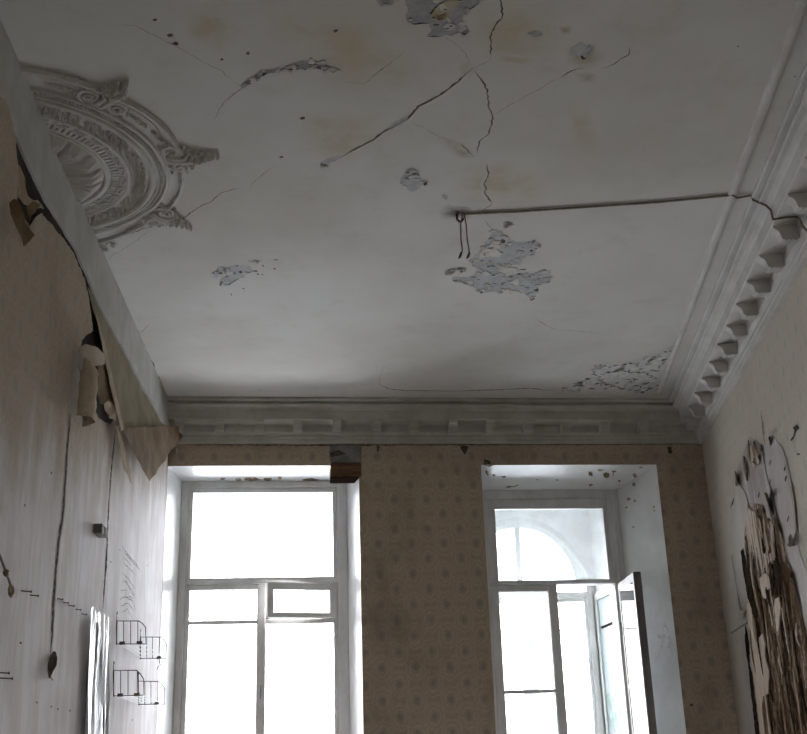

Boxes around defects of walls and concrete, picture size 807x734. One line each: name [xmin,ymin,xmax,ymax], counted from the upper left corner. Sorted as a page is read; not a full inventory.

peeling [376,0,484,38]
peeling [241,58,342,88]
crack [339,0,581,230]
peeling [9,165,44,246]
peeling [400,168,428,192]
peeling [212,260,264,295]
peeling [444,221,553,301]
peeling [88,288,182,483]
peeling [557,346,673,395]
spalling [731,435,807,734]